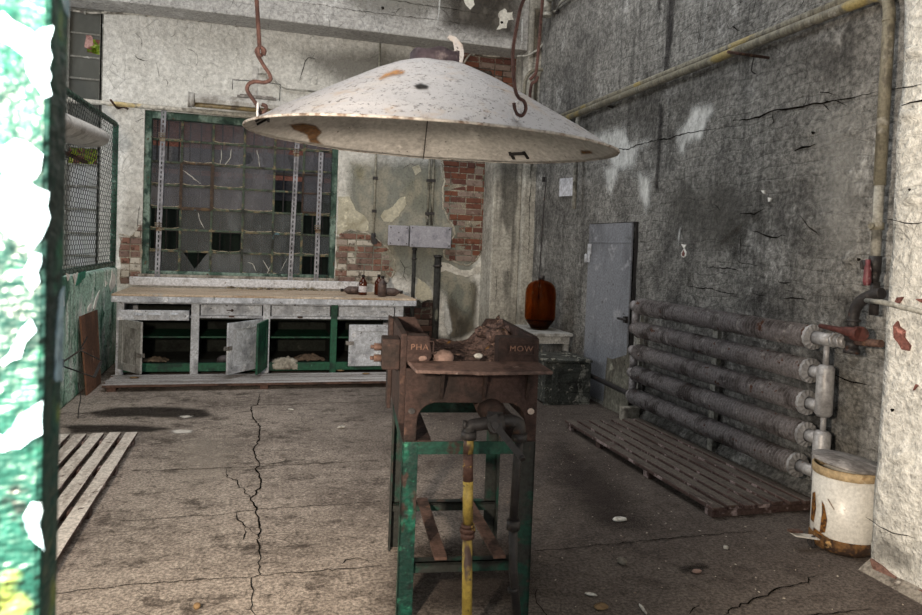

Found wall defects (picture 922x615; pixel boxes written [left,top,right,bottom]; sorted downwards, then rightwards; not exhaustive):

peeling [0,11,53,98]
flaking render [462,53,516,88]
crack [619,84,922,150]
peeling [0,139,50,291]
flaking render [87,225,143,311]
flaking render [335,196,396,285]
peeling [381,197,407,222]
flaking render [440,160,485,277]
peeling [54,270,86,382]
peeling [893,321,911,351]
crack [58,394,382,613]
crack [725,574,824,615]